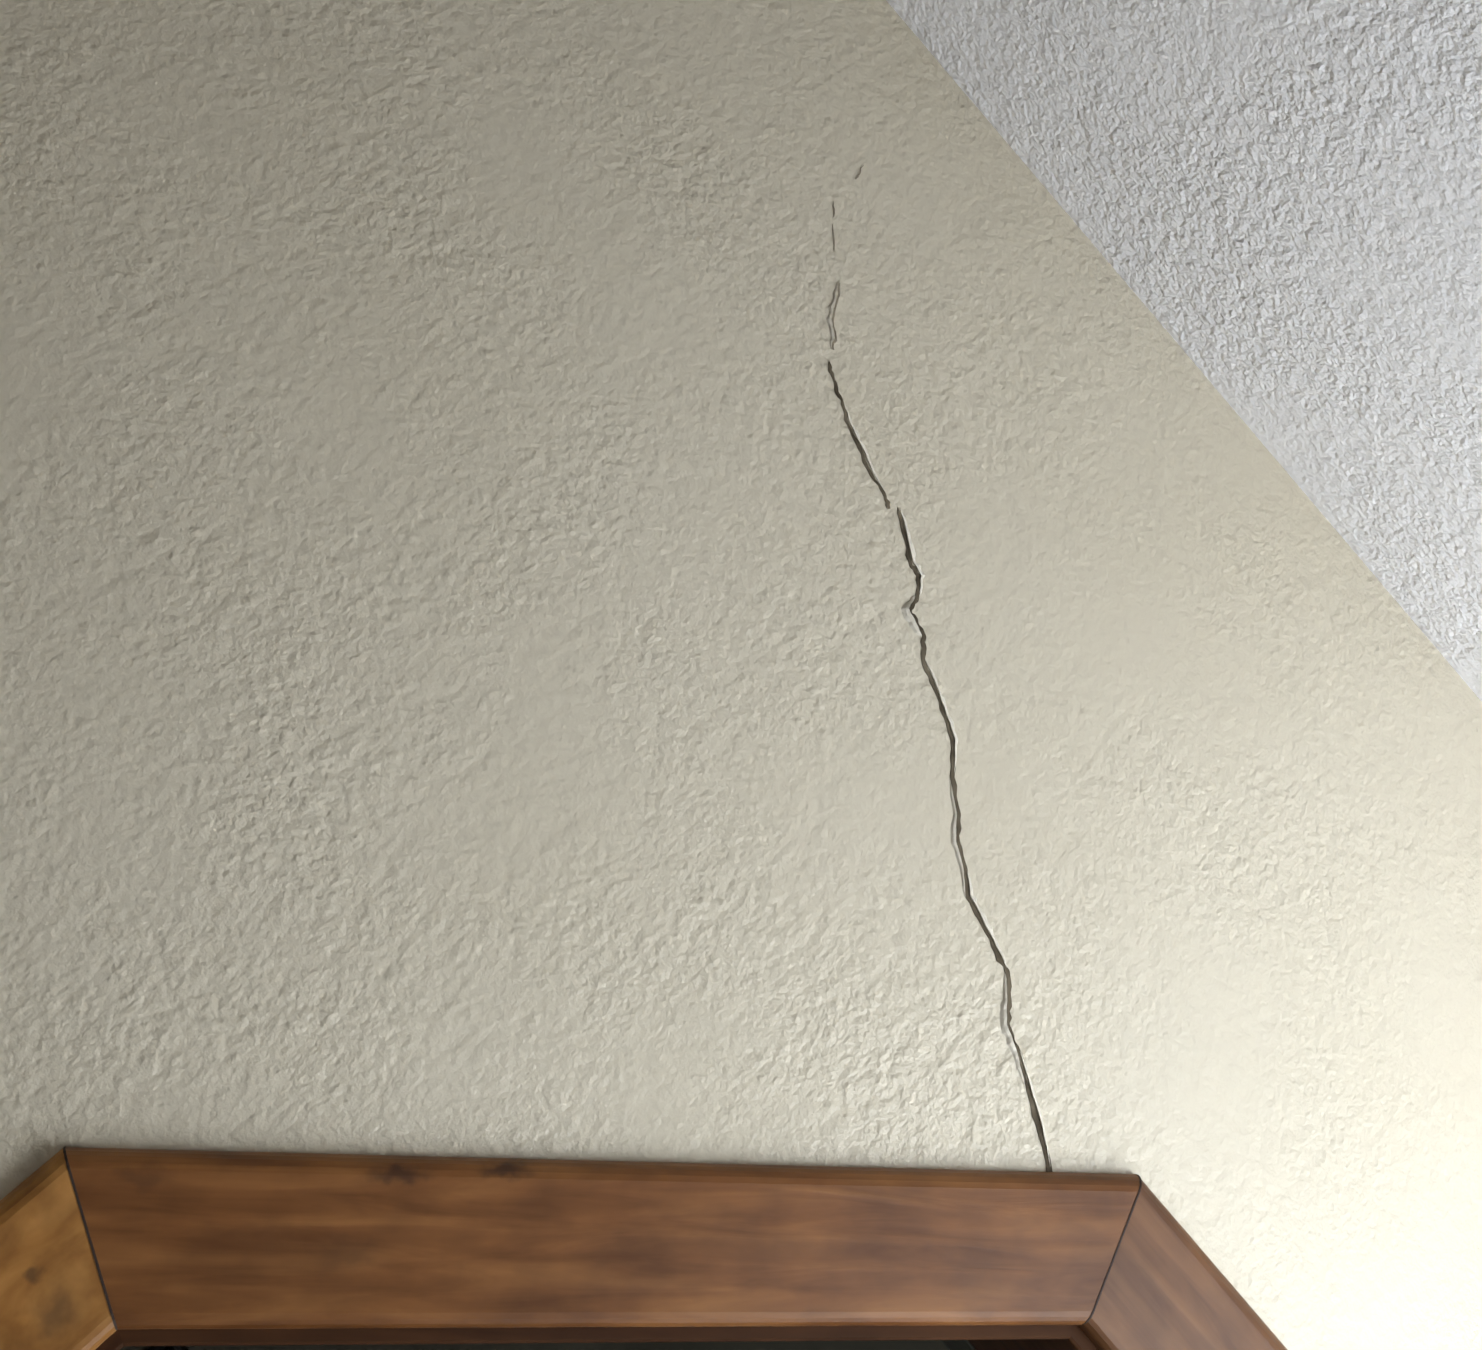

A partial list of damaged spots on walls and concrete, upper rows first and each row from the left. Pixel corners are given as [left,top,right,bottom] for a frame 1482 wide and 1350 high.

crack [826,165,1053,1172]